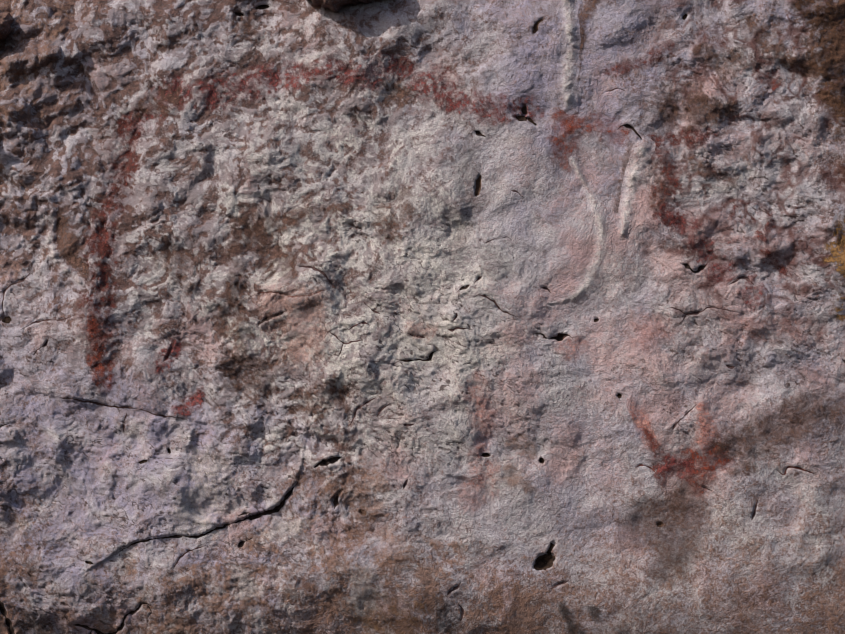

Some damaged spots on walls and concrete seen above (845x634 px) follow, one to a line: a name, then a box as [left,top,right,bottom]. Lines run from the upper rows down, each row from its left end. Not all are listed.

crack [22,315,74,355]
crack [59,397,194,432]
crack [112,456,343,567]
crack [0,601,15,634]
crack [74,602,151,634]